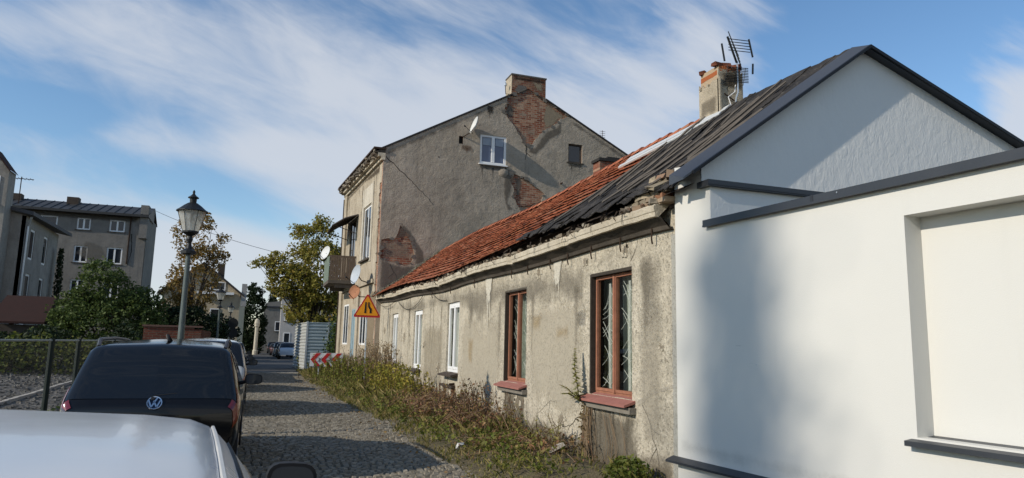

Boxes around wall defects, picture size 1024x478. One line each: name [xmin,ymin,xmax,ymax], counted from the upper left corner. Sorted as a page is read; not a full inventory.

flaking render [501,89,569,153]
flaking render [505,170,545,211]
spalling [626,169,675,211]
flaking render [366,183,423,357]